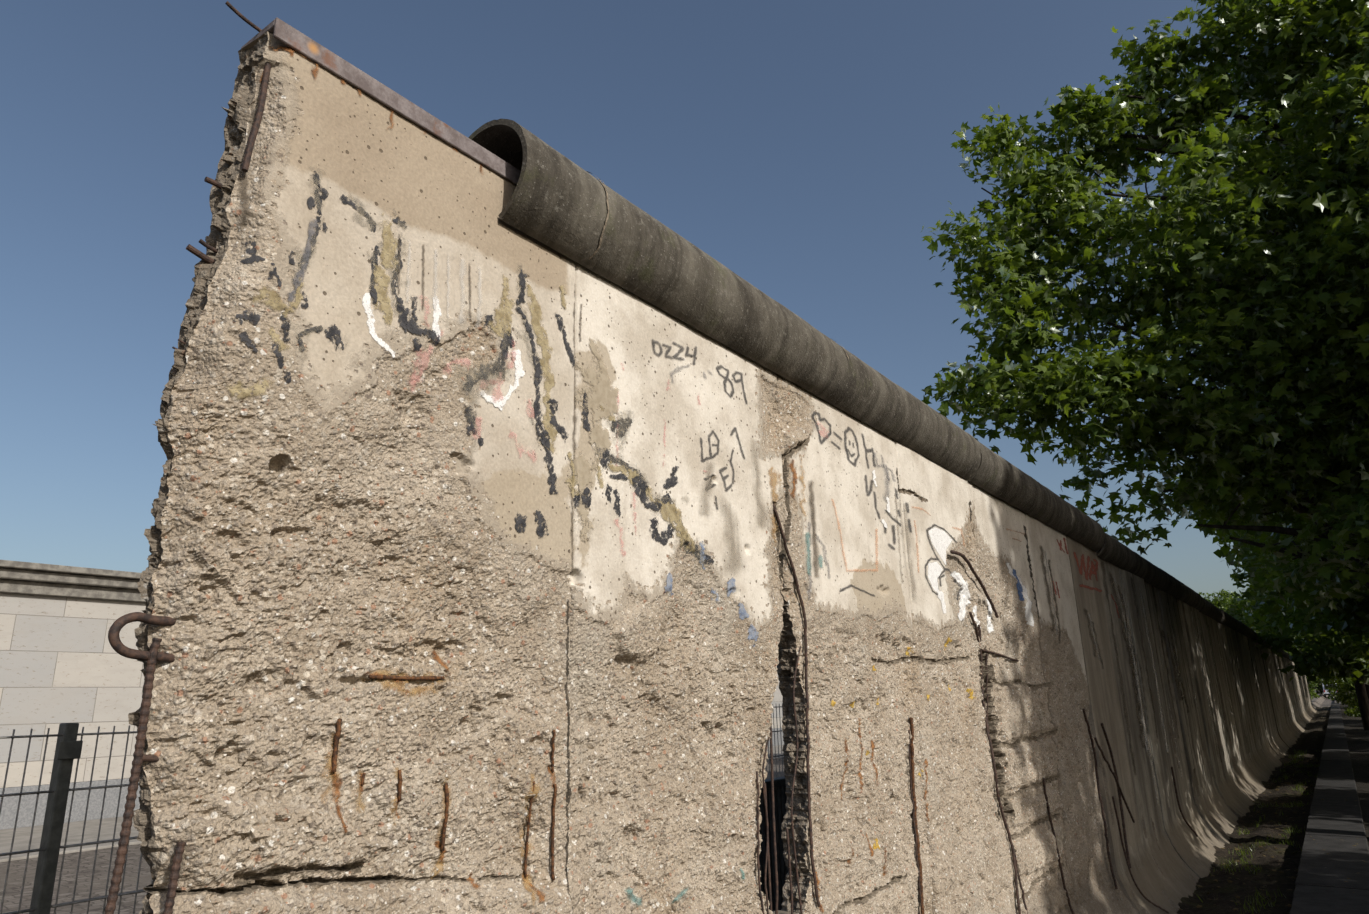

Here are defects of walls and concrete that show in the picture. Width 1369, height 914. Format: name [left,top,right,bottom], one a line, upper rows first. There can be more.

corrosion [271,46,318,77]
spalling [105,1,1169,914]
crack [772,434,811,584]
corrosion [365,650,449,694]
crack [144,600,573,908]
corrosion [328,753,347,833]
corrosion [433,841,446,877]
corrosion [522,866,545,902]
crack [833,873,907,914]